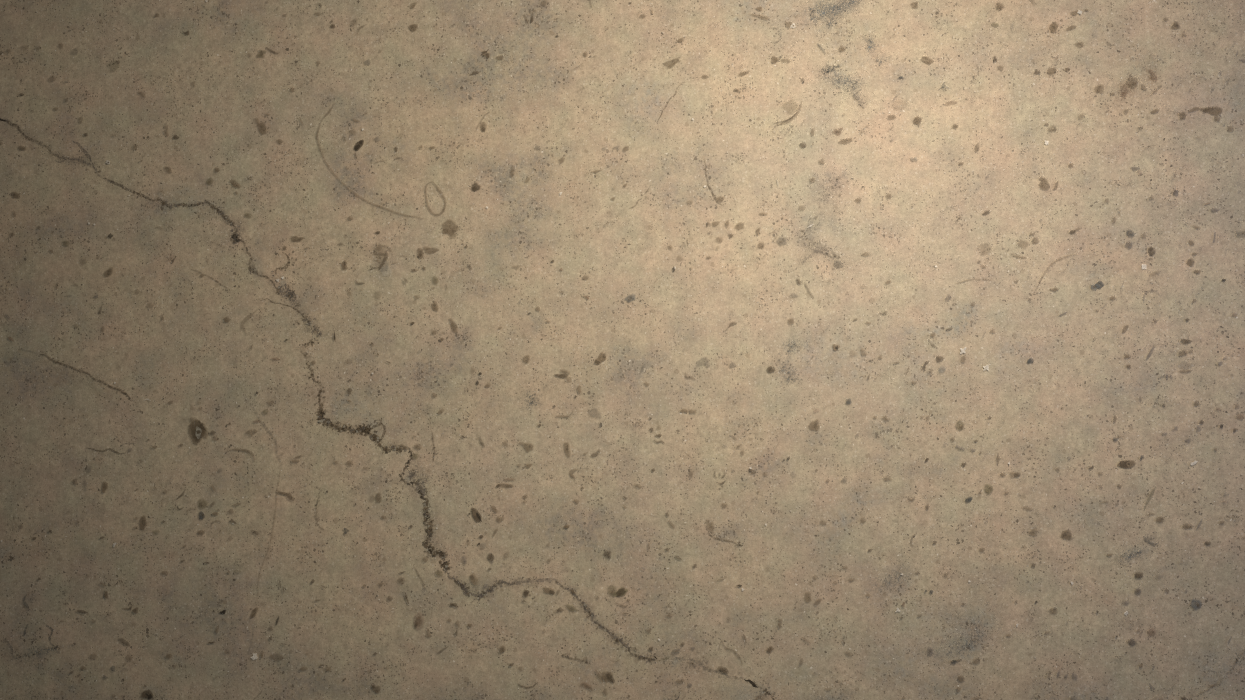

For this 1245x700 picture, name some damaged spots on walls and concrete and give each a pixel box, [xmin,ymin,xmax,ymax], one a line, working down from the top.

crack [309,377,497,598]